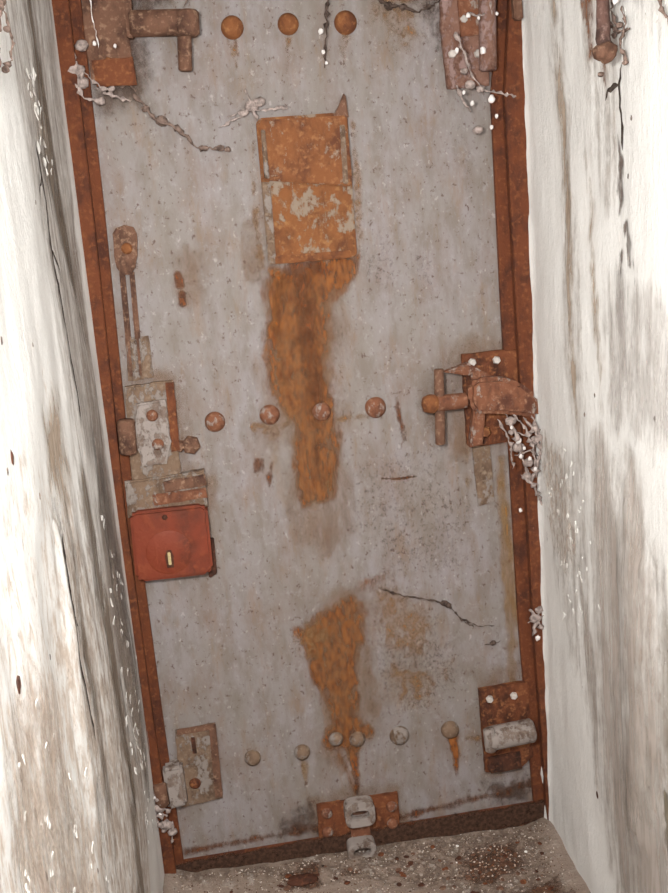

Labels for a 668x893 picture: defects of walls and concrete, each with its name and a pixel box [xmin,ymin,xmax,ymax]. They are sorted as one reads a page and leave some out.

water stain [44,398,70,534]
crack [35,142,81,417]
rust [250,255,359,508]
water stain [558,66,572,331]
water stain [618,143,631,273]
crack [60,522,96,739]
water stain [81,437,150,893]
rust [294,595,374,794]
rust [448,736,479,770]
water stain [594,445,668,893]